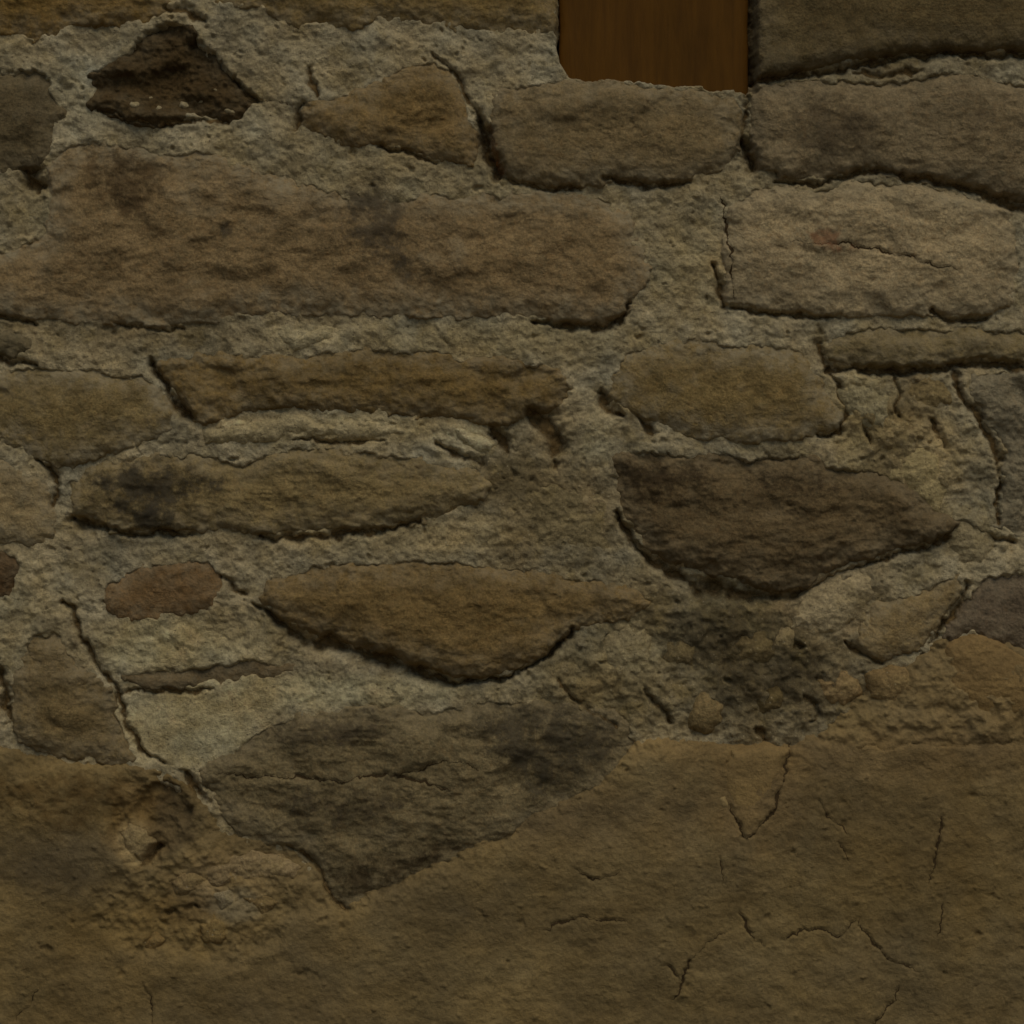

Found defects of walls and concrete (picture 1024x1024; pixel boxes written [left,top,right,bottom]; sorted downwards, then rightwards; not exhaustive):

crack [721,199,735,300]
crack [798,240,960,270]
crack [730,743,791,840]
crack [544,915,625,931]
crack [668,910,914,1024]
crack [928,816,944,935]